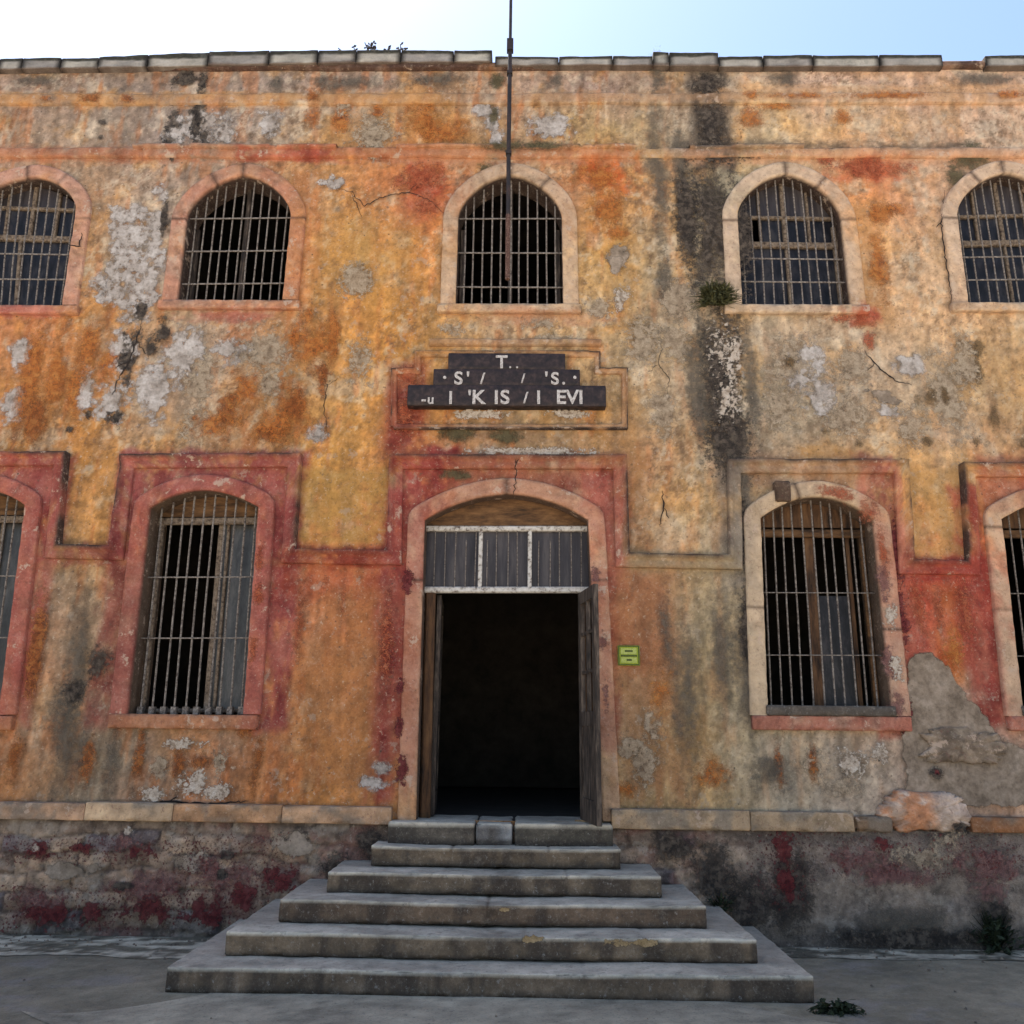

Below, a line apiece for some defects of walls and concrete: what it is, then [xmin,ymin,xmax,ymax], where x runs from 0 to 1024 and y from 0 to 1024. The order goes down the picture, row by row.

crack [335,184,444,217]
peeling [472,104,505,144]
peeling [526,112,577,138]
water stain [646,72,761,304]
peeling [66,183,301,442]
water stain [686,306,760,481]
peeling [587,243,981,454]
crack [865,351,911,385]
water stain [52,623,115,773]
peeling [132,737,233,802]
flaking render [617,708,666,791]
flaking render [793,647,1024,807]